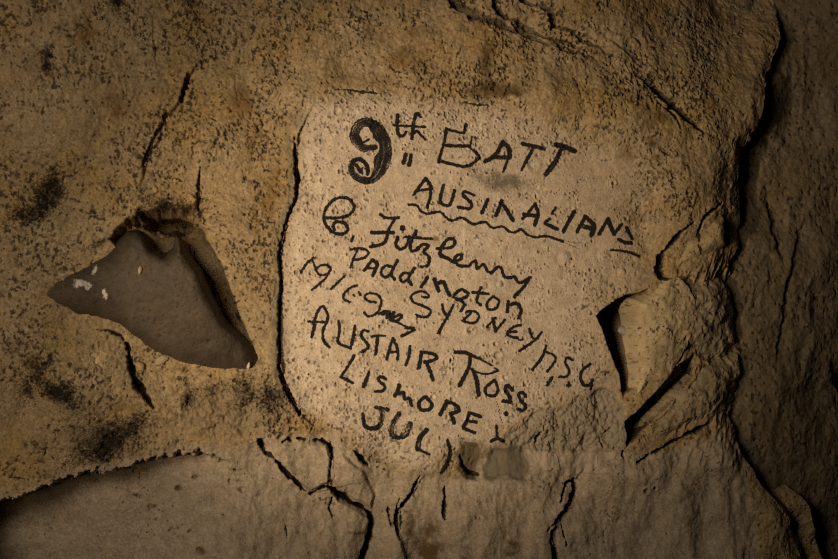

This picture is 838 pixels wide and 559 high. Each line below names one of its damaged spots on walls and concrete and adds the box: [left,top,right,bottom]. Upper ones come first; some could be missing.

crack [142,73,191,167]
crack [335,87,378,95]
crack [463,100,488,108]
crack [636,76,703,134]
crack [277,137,301,416]
crack [100,330,154,408]
crack [459,454,479,476]
crack [598,423,708,464]
crack [257,437,418,559]
crack [440,486,448,519]
crack [547,479,574,559]